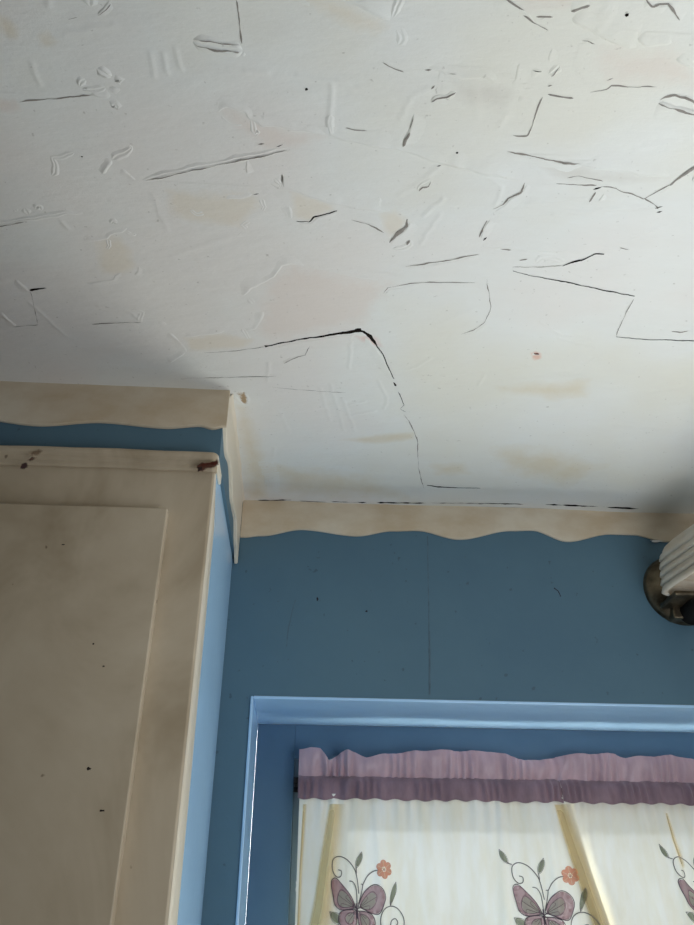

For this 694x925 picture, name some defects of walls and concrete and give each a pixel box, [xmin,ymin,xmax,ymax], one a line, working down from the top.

crack [146,150,287,181]
crack [385,240,693,341]
crack [209,328,522,505]
rust [197,460,219,472]
crack [546,502,636,510]